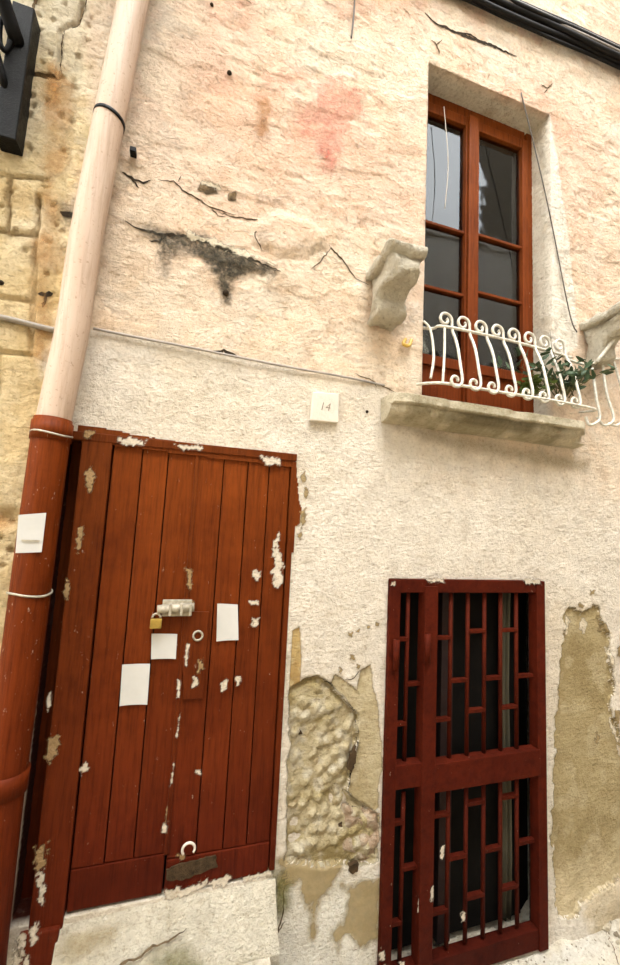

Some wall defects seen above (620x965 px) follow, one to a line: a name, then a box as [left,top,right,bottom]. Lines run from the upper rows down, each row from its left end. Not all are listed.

crack [34,0,87,81]
crack [122,172,280,271]
crack [311,245,367,284]
flaking render [331,654,382,874]
flaking render [549,590,620,920]
crack [119,928,187,965]